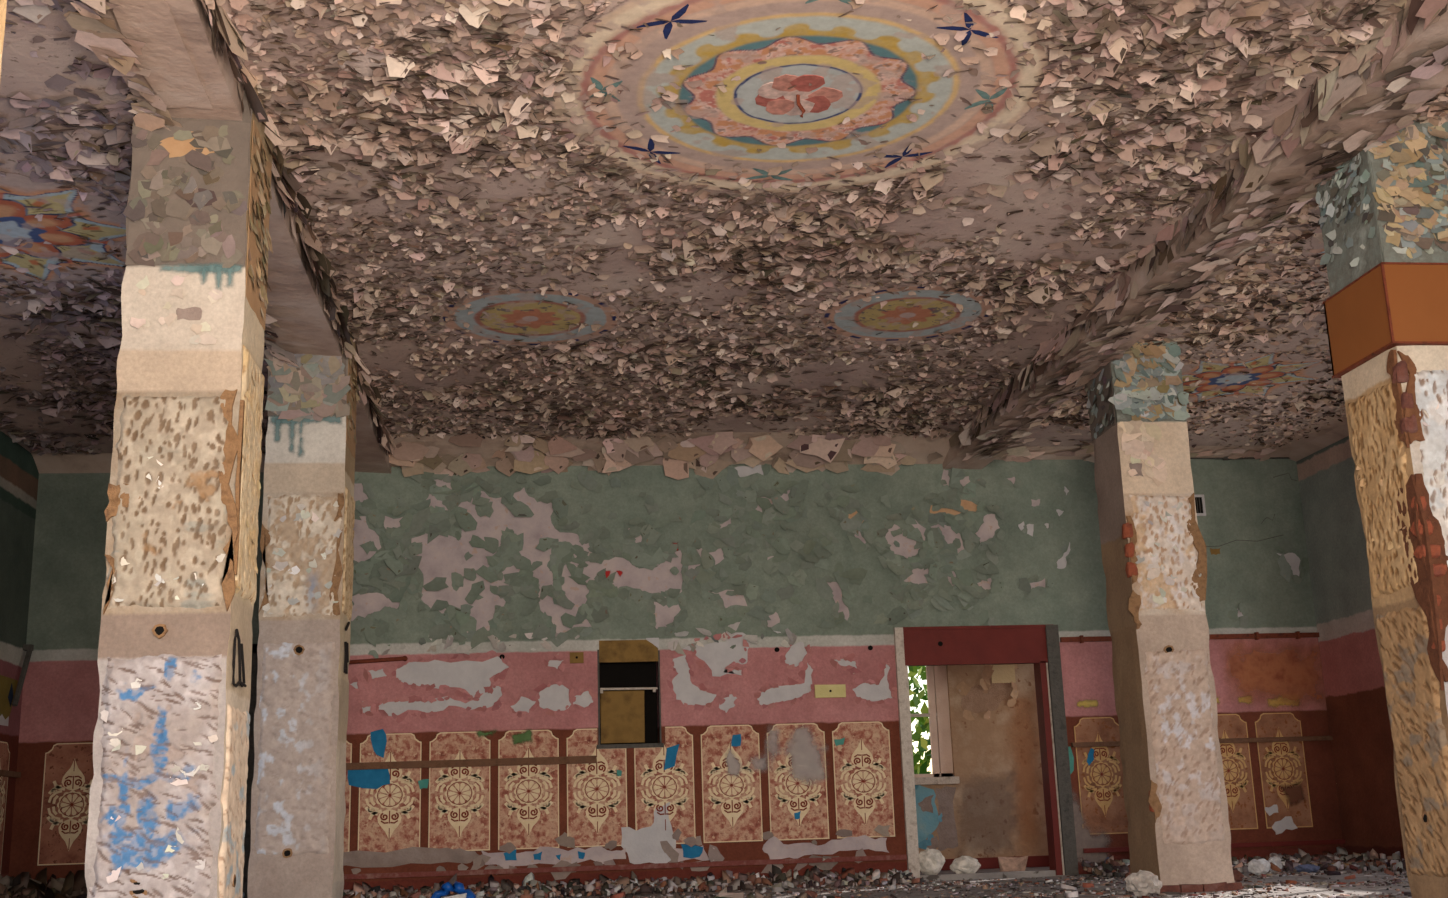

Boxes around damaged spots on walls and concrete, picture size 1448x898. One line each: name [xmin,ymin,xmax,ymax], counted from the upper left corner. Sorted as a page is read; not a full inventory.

peeling [0,0,1448,629]
peeling [259,472,730,723]
peeling [667,622,758,711]
peeling [719,691,739,717]
peeling [830,653,898,708]
damp [1228,646,1324,707]
spalling [1144,645,1225,845]
peeling [660,829,724,871]
peeling [761,825,890,873]